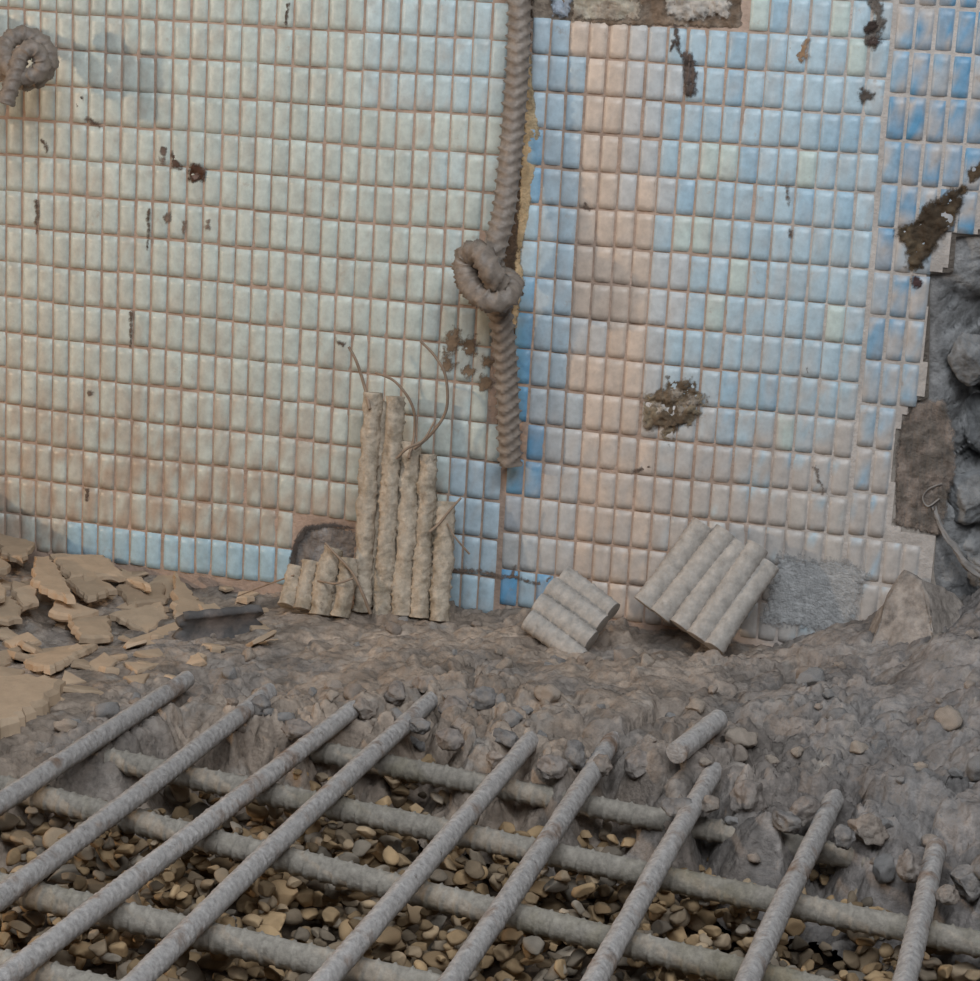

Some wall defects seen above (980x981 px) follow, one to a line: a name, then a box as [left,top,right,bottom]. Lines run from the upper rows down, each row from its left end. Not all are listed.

spalling [451,0,742,468]
peeling [893,399,956,535]
spalling [0,671,980,981]